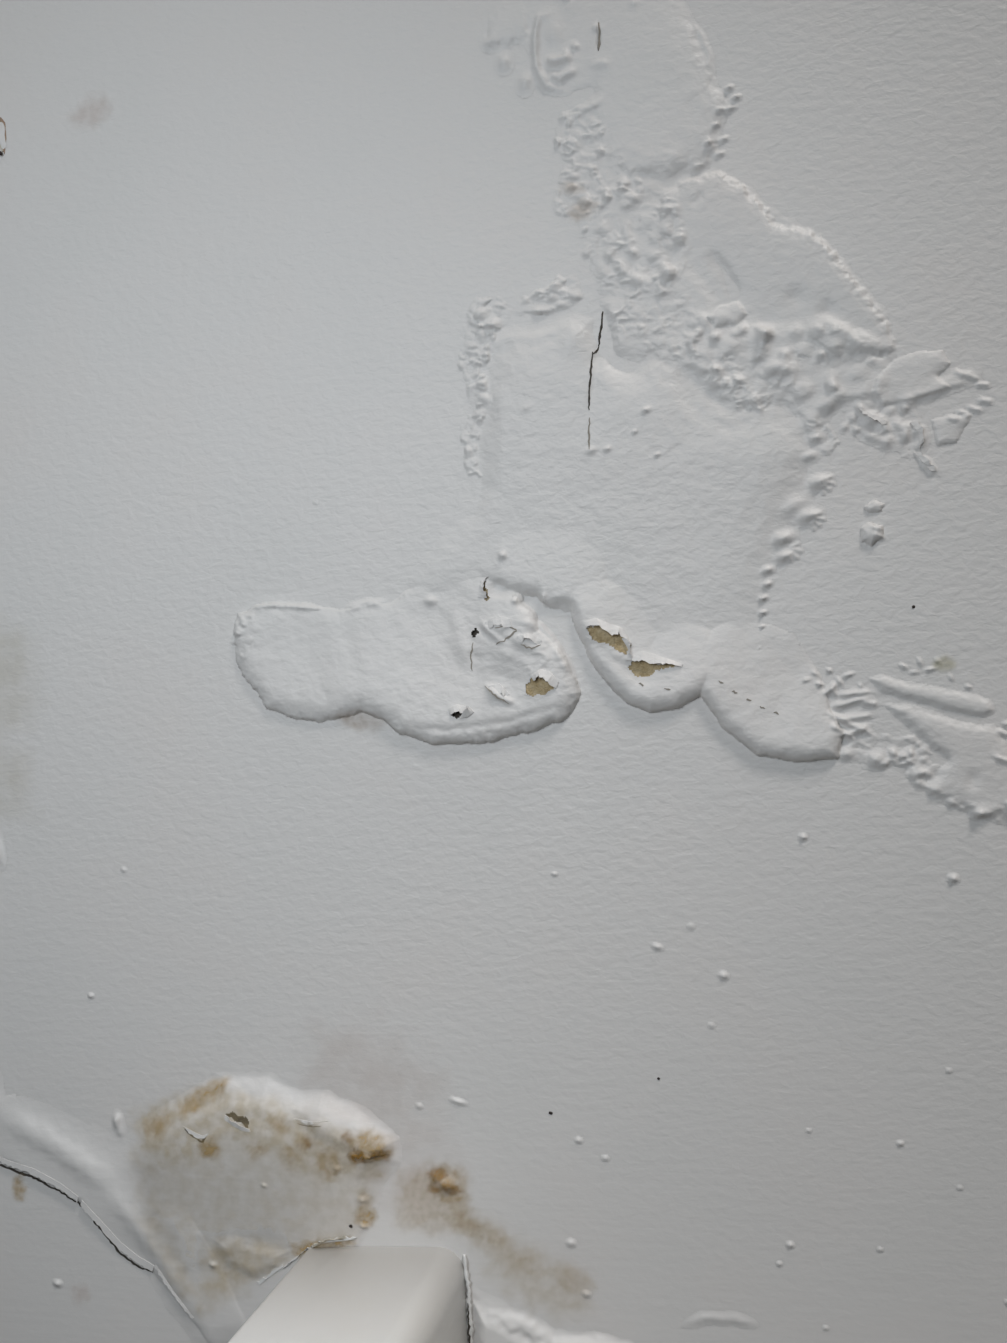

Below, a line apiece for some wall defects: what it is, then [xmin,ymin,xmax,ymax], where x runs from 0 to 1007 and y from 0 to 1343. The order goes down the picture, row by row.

crack [588,311,603,449]
peeling [230,563,846,763]